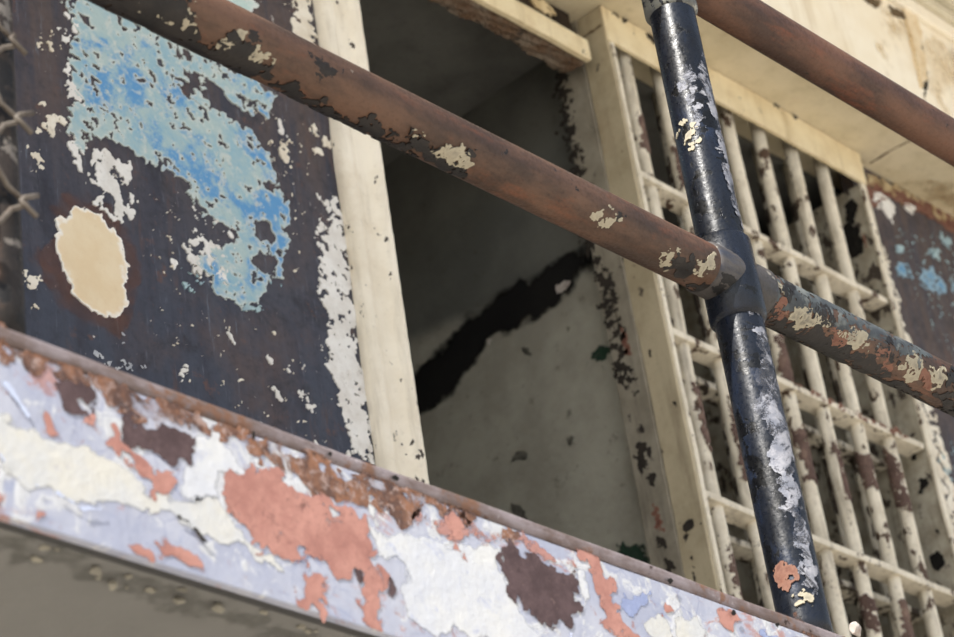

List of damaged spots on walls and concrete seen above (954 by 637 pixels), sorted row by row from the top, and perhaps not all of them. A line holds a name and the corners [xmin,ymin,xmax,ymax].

peeling [26,145,45,172]
peeling [35,0,478,318]
peeling [23,269,43,290]
peeling [313,193,375,465]
peeling [105,423,178,501]
rust [0,340,488,530]
peeling [297,390,317,423]
peeling [749,174,954,596]
peeling [128,538,204,569]
peeling [222,457,390,632]
peeling [576,549,640,637]
spalling [849,621,861,637]